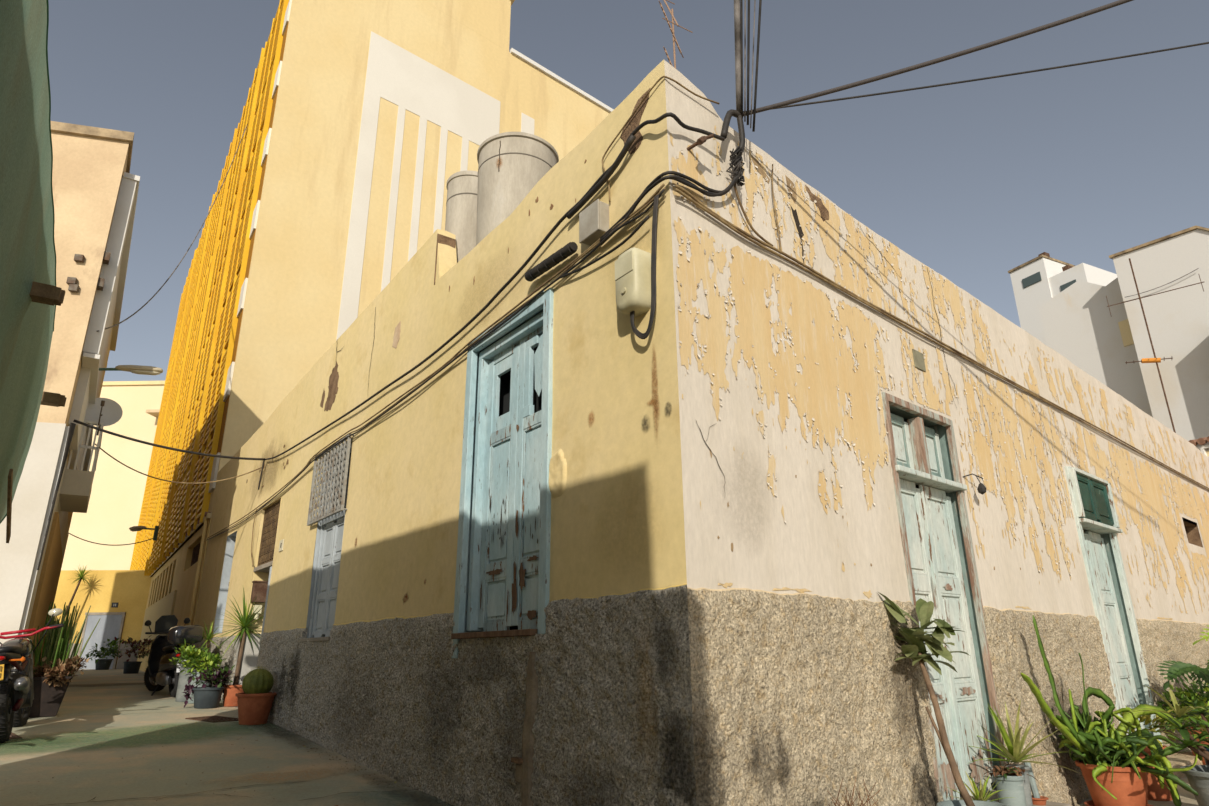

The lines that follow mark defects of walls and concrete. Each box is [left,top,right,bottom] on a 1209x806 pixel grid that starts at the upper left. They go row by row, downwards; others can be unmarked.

spalling [620,88,650,154]
spalling [320,361,339,411]
peeling [670,125,1209,620]
peeling [480,555,539,622]